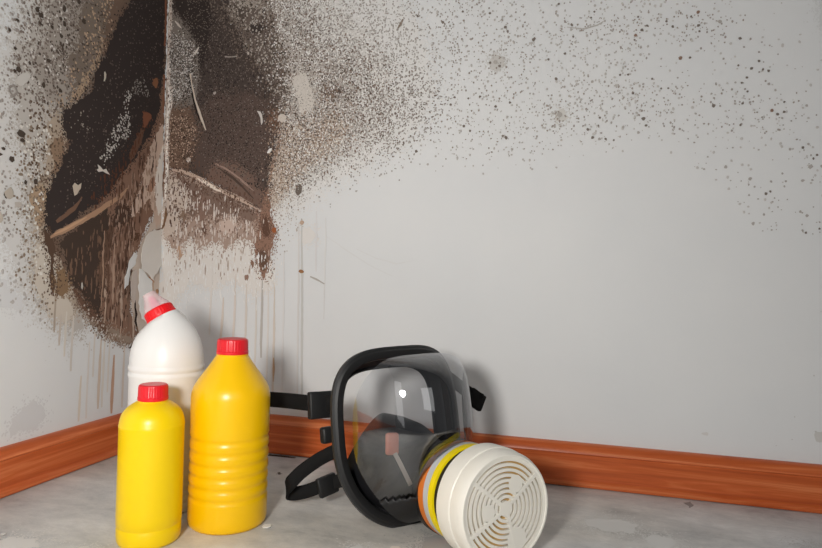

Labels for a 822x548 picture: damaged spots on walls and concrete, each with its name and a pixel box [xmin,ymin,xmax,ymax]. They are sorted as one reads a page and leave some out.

peeling [124,0,207,332]
leakage [0,0,822,421]